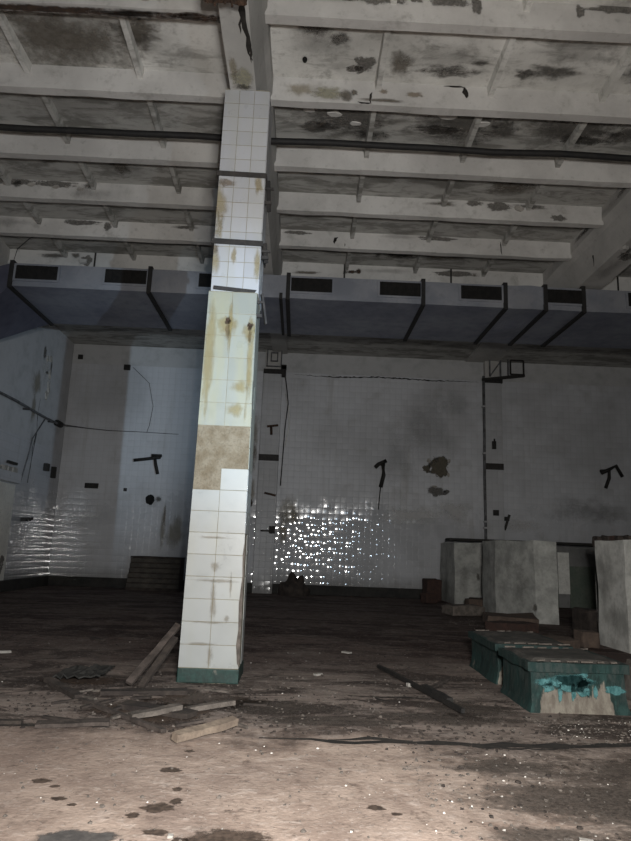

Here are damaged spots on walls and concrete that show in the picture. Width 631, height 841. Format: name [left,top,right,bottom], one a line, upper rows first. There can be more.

leakage [3,10,153,68]
leakage [317,89,338,98]
leakage [300,108,389,139]
leakage [416,115,522,143]
leakage [534,120,631,145]
peeling [193,425,250,490]
spalling [422,456,451,497]